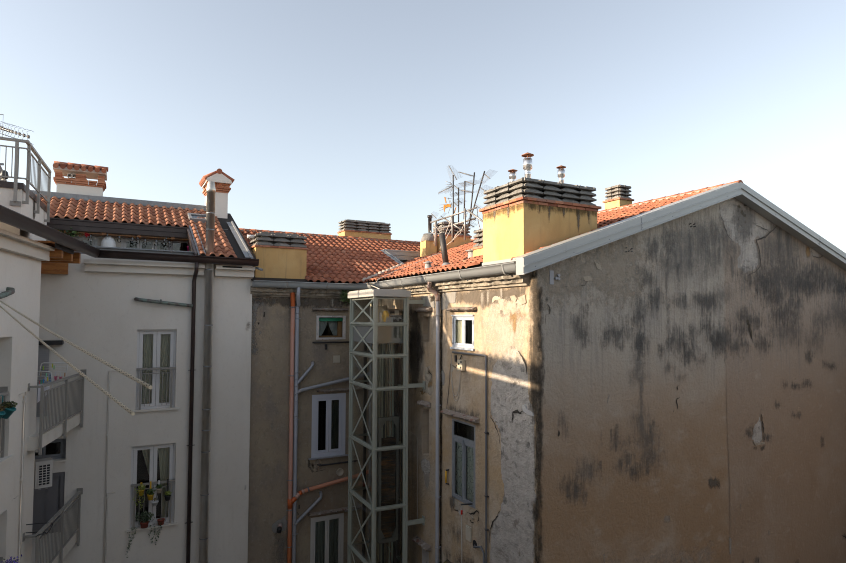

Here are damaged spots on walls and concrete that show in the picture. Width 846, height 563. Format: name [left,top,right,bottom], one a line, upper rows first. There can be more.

water stain [658,310,760,364]
peeling [489,346,536,563]
peeling [752,409,765,450]